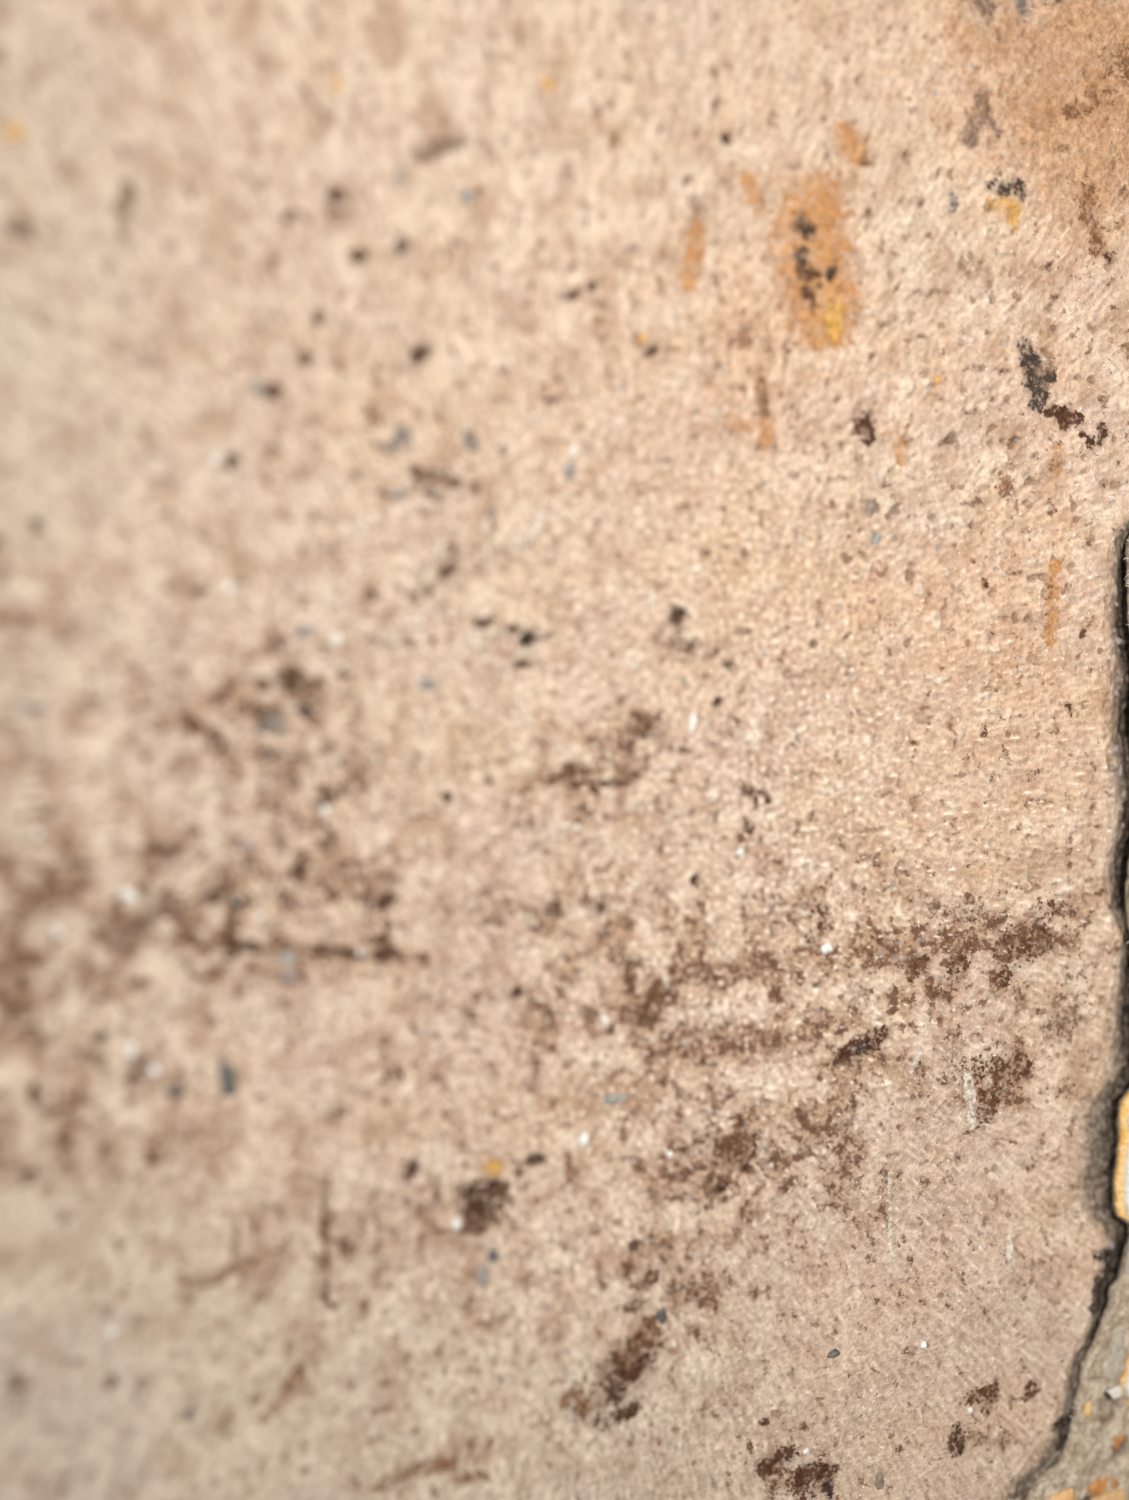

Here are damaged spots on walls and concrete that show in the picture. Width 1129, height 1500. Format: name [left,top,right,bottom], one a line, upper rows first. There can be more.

rust [739,121,874,360]